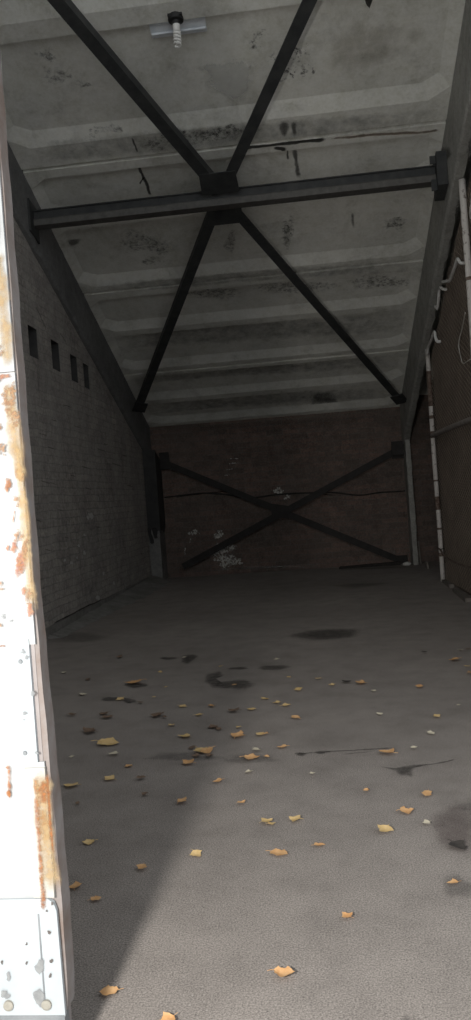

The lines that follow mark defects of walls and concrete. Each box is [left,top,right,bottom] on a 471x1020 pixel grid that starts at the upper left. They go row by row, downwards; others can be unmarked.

crack [132,139,151,194]
damp [248,123,324,175]
damp [337,129,437,138]
rust [0,257,11,359]
rust [0,374,34,617]
efflorescence [213,530,243,569]
rust [33,778,58,908]